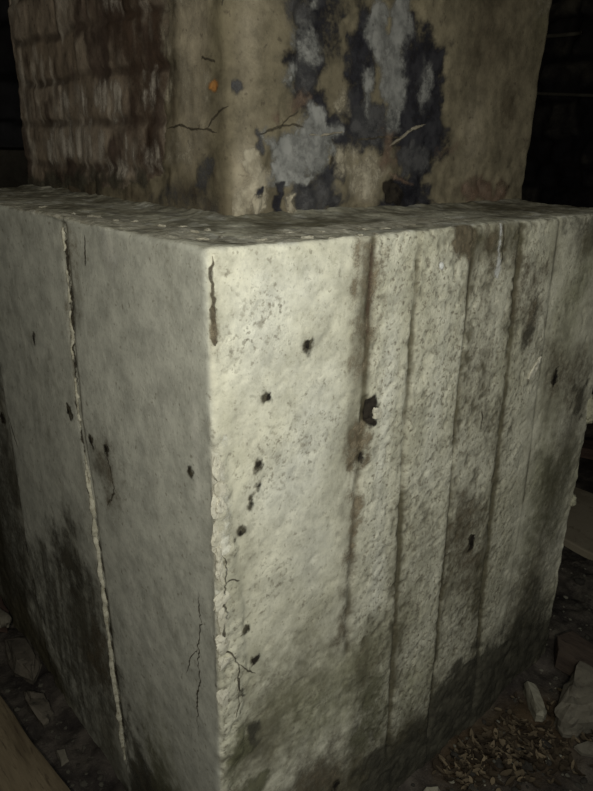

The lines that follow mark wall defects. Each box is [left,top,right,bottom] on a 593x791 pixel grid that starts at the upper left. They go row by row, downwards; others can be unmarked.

peeling [284,28,322,87]
peeling [363,0,414,135]
peeling [418,67,433,102]
crack [169,106,228,133]
crack [260,111,302,135]
peeling [234,102,429,216]
leakage [0,434,130,718]
crack [187,556,256,727]
leakage [351,578,551,791]
leakage [227,721,260,768]
leakage [243,769,269,791]